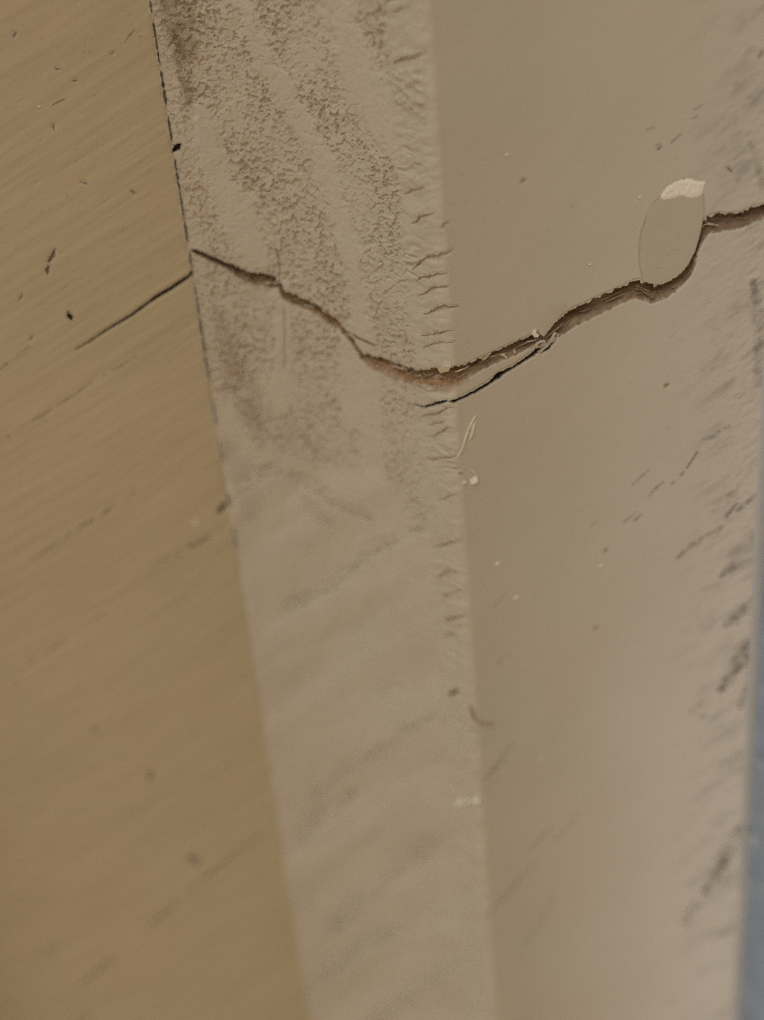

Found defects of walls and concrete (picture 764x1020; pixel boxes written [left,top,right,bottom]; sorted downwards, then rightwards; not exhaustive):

crack [75,0,764,464]
peeling [637,176,707,284]